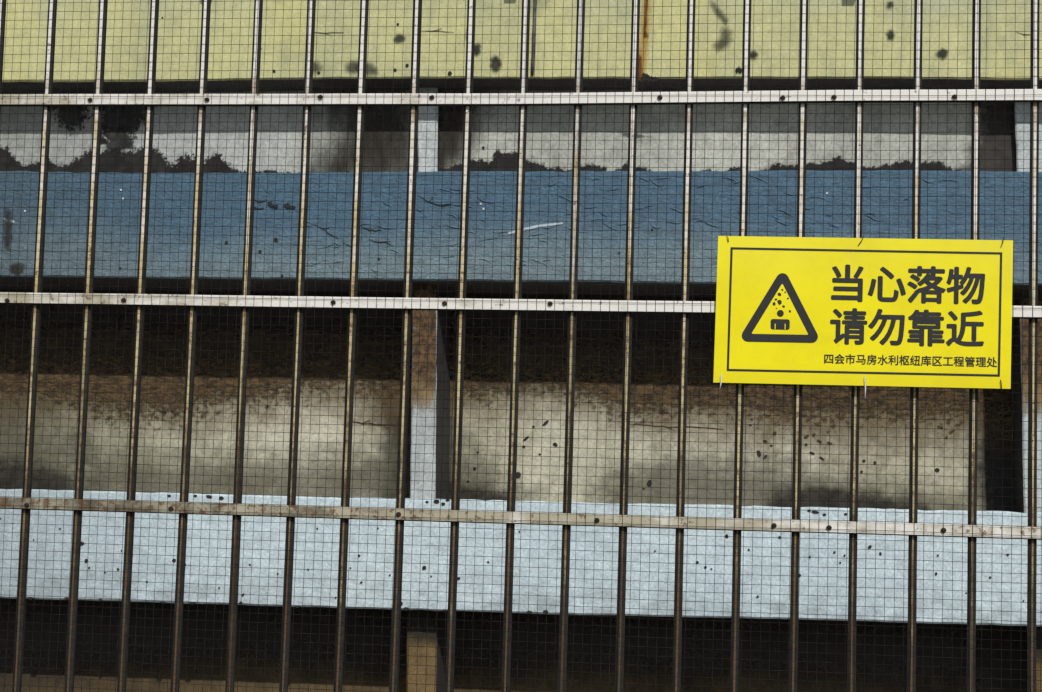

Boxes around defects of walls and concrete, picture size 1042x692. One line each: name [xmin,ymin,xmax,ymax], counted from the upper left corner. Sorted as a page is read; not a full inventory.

rust [638,0,649,79]
damp [713,5,730,49]
damp [52,106,157,153]
damp [311,90,418,173]
damp [10,263,24,275]
damp [0,284,1042,512]